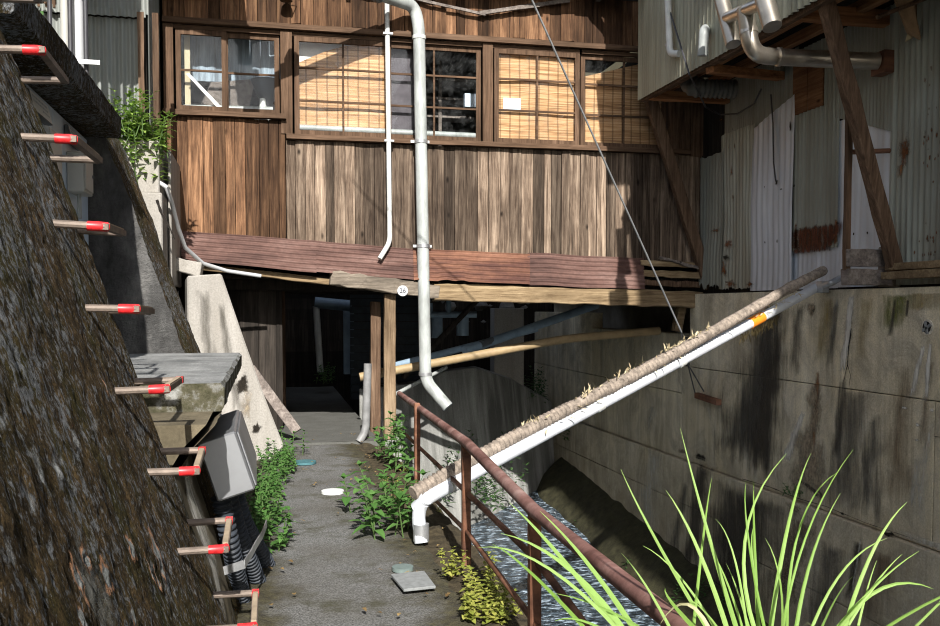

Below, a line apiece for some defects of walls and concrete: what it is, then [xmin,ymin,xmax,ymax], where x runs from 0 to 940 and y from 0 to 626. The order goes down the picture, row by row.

corrosion [791,220,841,253]
water stain [723,310,803,470]
water stain [834,382,878,509]
peeling [70,542,114,626]
peeling [124,526,167,591]
water stain [673,466,706,563]
water stain [710,490,777,601]
water stain [810,544,861,619]
water stain [864,557,887,611]